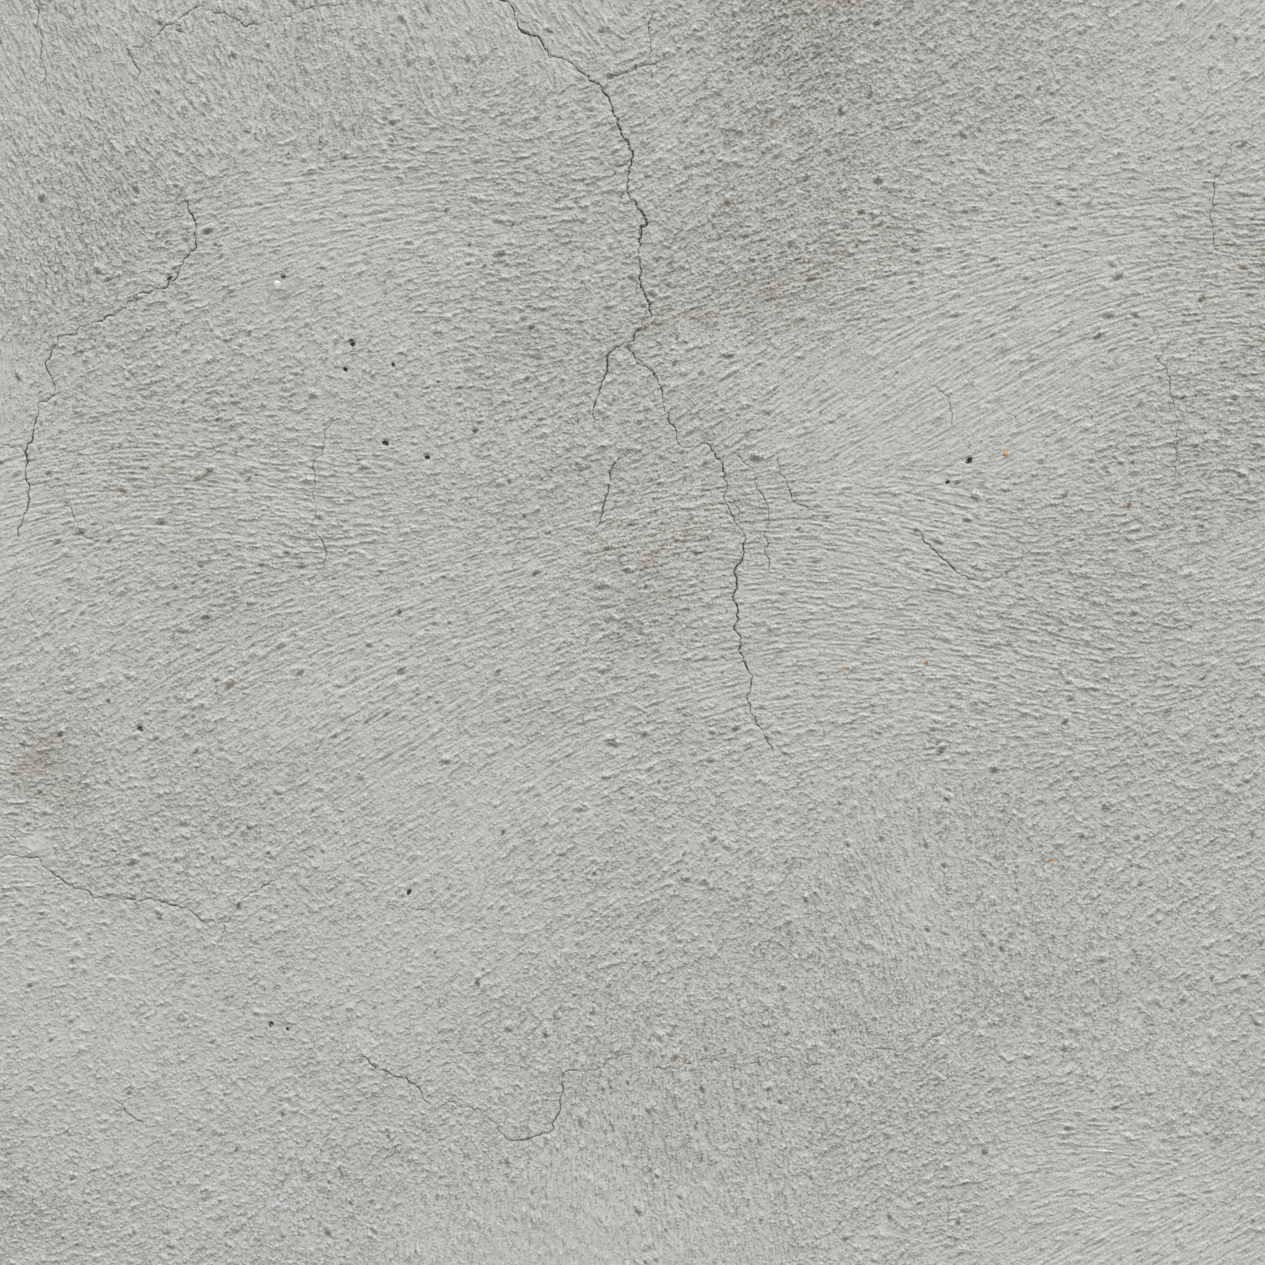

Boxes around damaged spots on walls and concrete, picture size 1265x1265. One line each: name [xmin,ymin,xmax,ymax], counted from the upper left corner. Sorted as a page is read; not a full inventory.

crack [128,0,349,82]
crack [1,201,197,541]
crack [309,417,334,568]
crack [500,0,815,752]